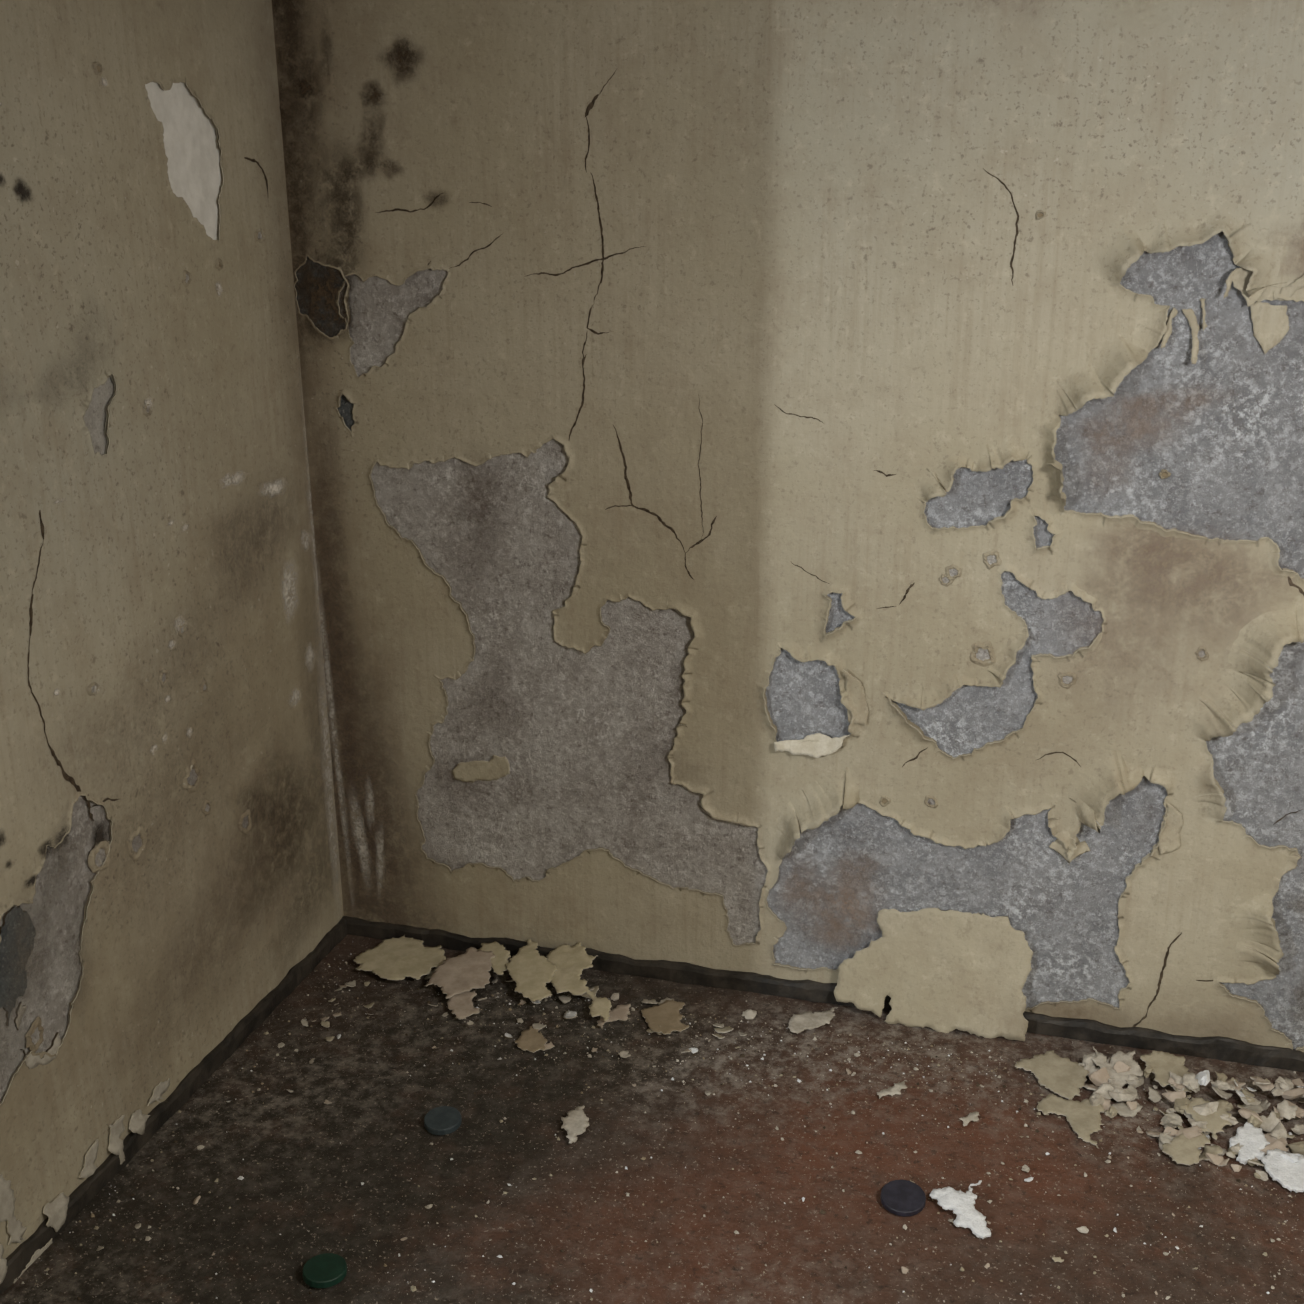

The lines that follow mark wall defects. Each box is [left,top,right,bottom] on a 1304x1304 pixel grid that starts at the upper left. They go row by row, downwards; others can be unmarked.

damp [0,175,30,201]
peeling [142,75,225,245]
damp [263,480,283,495]
damp [279,51,350,335]
crack [527,70,645,440]
crack [605,394,717,580]
peeling [916,205,1304,588]
crack [28,511,119,821]
damp [307,648,395,877]
peeling [365,432,1304,1052]
peeling [0,789,114,1108]
peeling [1015,1050,1105,1149]